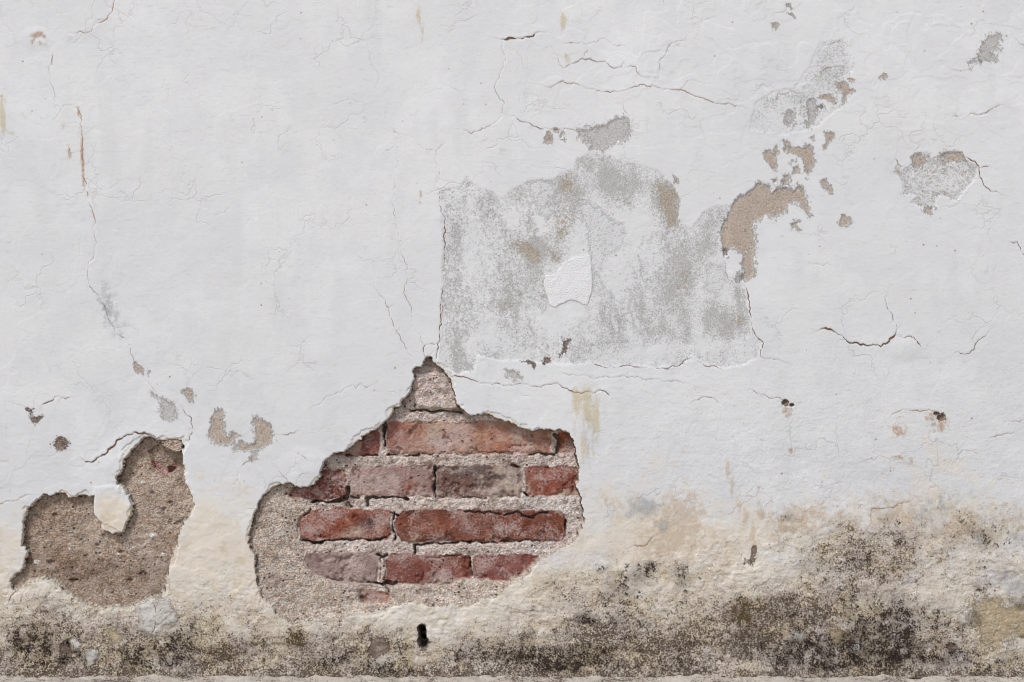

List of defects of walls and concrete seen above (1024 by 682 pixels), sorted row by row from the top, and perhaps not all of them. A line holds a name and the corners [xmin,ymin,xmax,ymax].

crack [558,42,733,112]
peeling [490,70,856,345]
flaking render [897,148,975,217]
crack [822,308,919,347]
flaking render [206,407,275,462]
flaking render [248,270,585,625]
flaking render [10,436,195,639]
leakage [6,624,85,668]
leakage [120,624,202,670]
leakage [454,633,622,675]
leakage [599,561,660,638]
leakage [723,584,1018,675]